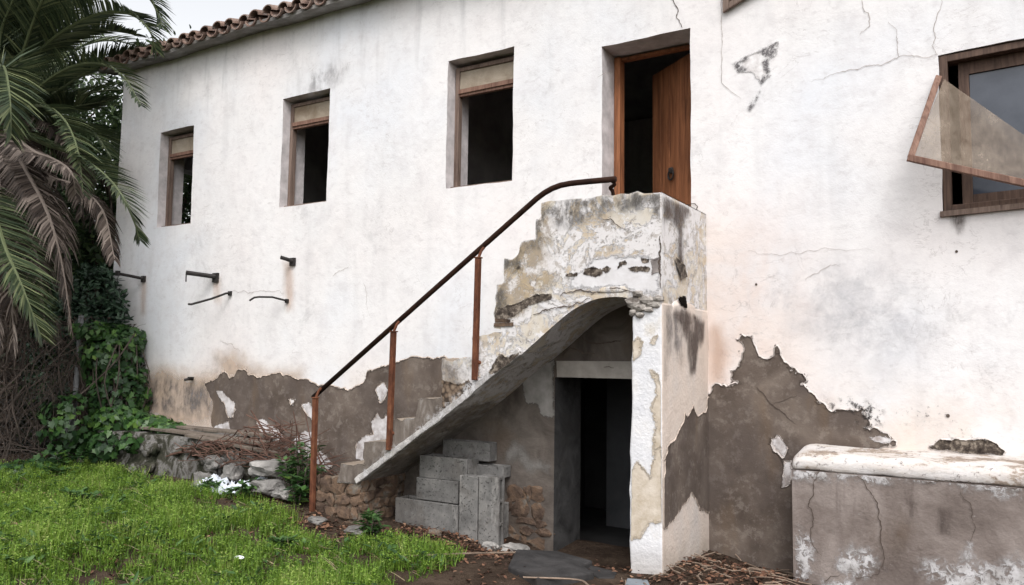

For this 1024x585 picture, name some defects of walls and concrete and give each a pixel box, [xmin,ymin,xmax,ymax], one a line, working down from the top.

flaking render [734,41,779,84]
crack [815,2,942,80]
flaking render [565,257,661,277]
flaking render [495,294,552,322]
spalling [625,290,665,318]
damp [668,310,705,373]
flaking render [204,355,447,483]
flaking render [630,333,898,585]
flaking render [928,437,1006,456]
crack [808,469,885,582]
crack [918,479,1021,541]
peeling [923,543,1024,585]